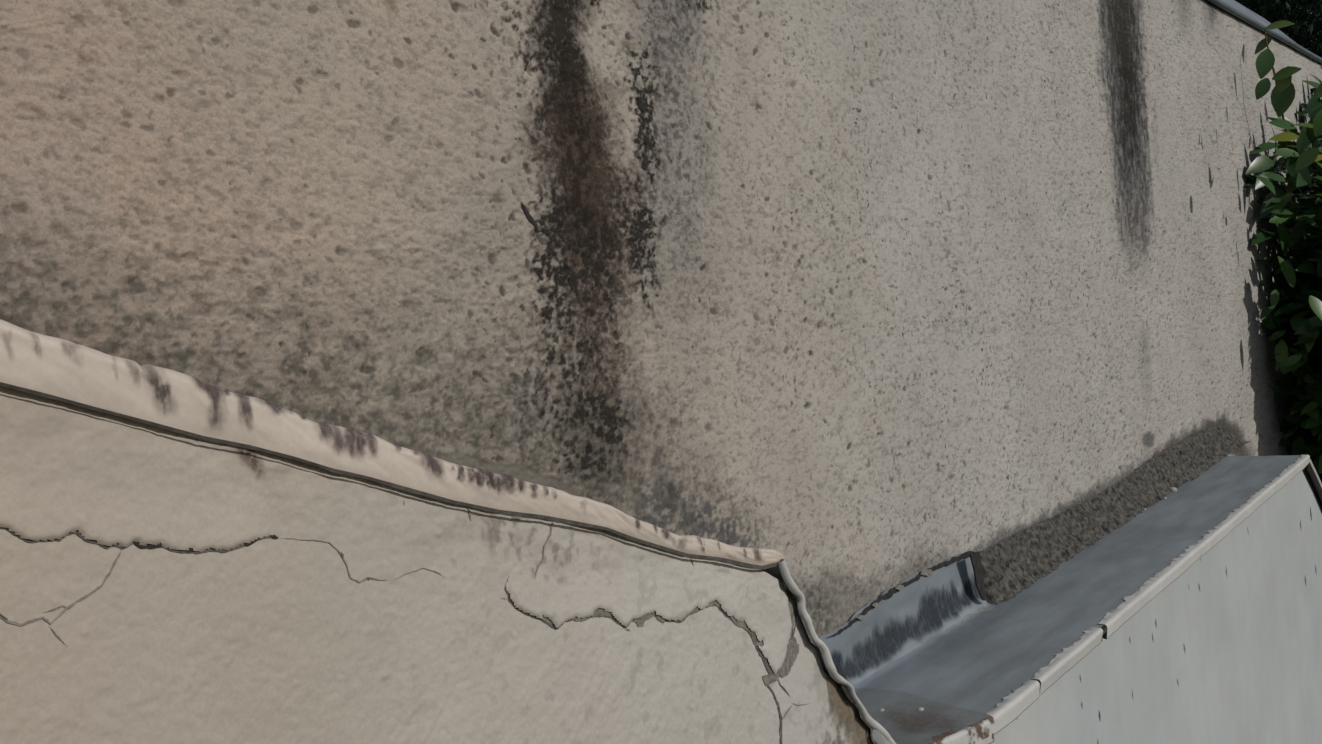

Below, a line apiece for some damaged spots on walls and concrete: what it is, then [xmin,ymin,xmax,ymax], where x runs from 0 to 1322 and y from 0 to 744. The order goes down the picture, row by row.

leakage [1101,0,1151,246]
leakage [0,0,760,558]
leakage [1144,418,1251,460]
crack [0,527,441,645]
crack [500,521,809,744]
corrosion [929,716,994,744]